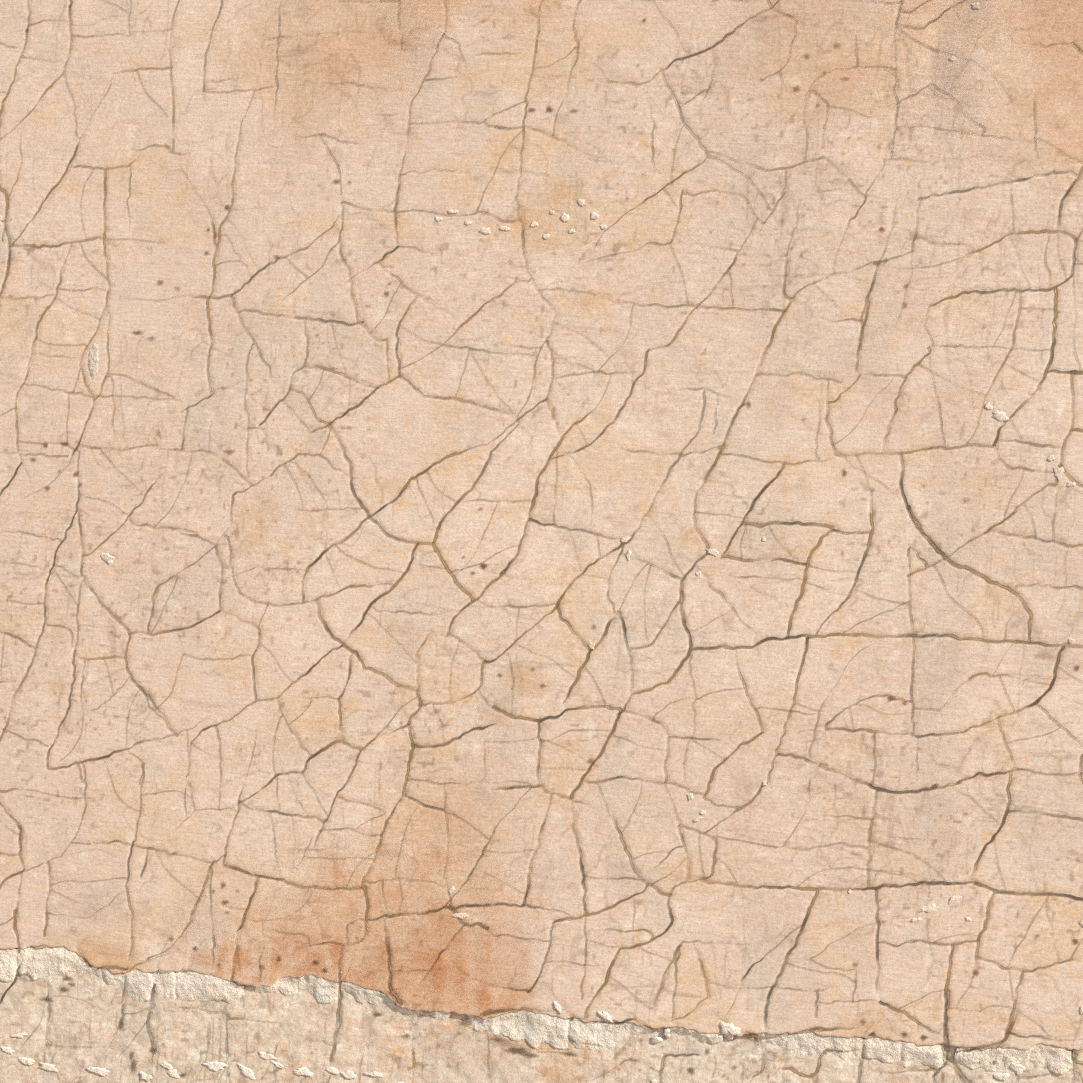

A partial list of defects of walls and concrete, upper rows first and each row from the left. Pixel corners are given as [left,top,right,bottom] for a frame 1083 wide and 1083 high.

crack [885,0,966,52]
crack [631,0,794,213]
crack [0,67,181,303]
crack [0,160,1083,882]
crack [0,788,52,1013]
crack [71,823,178,1055]
flaking render [0,946,451,1020]
flaking render [0,1033,58,1072]
flaking render [202,1061,256,1080]
flaking render [258,1052,383,1079]
flaking render [463,1001,741,1057]
flaking render [757,1032,1083,1081]